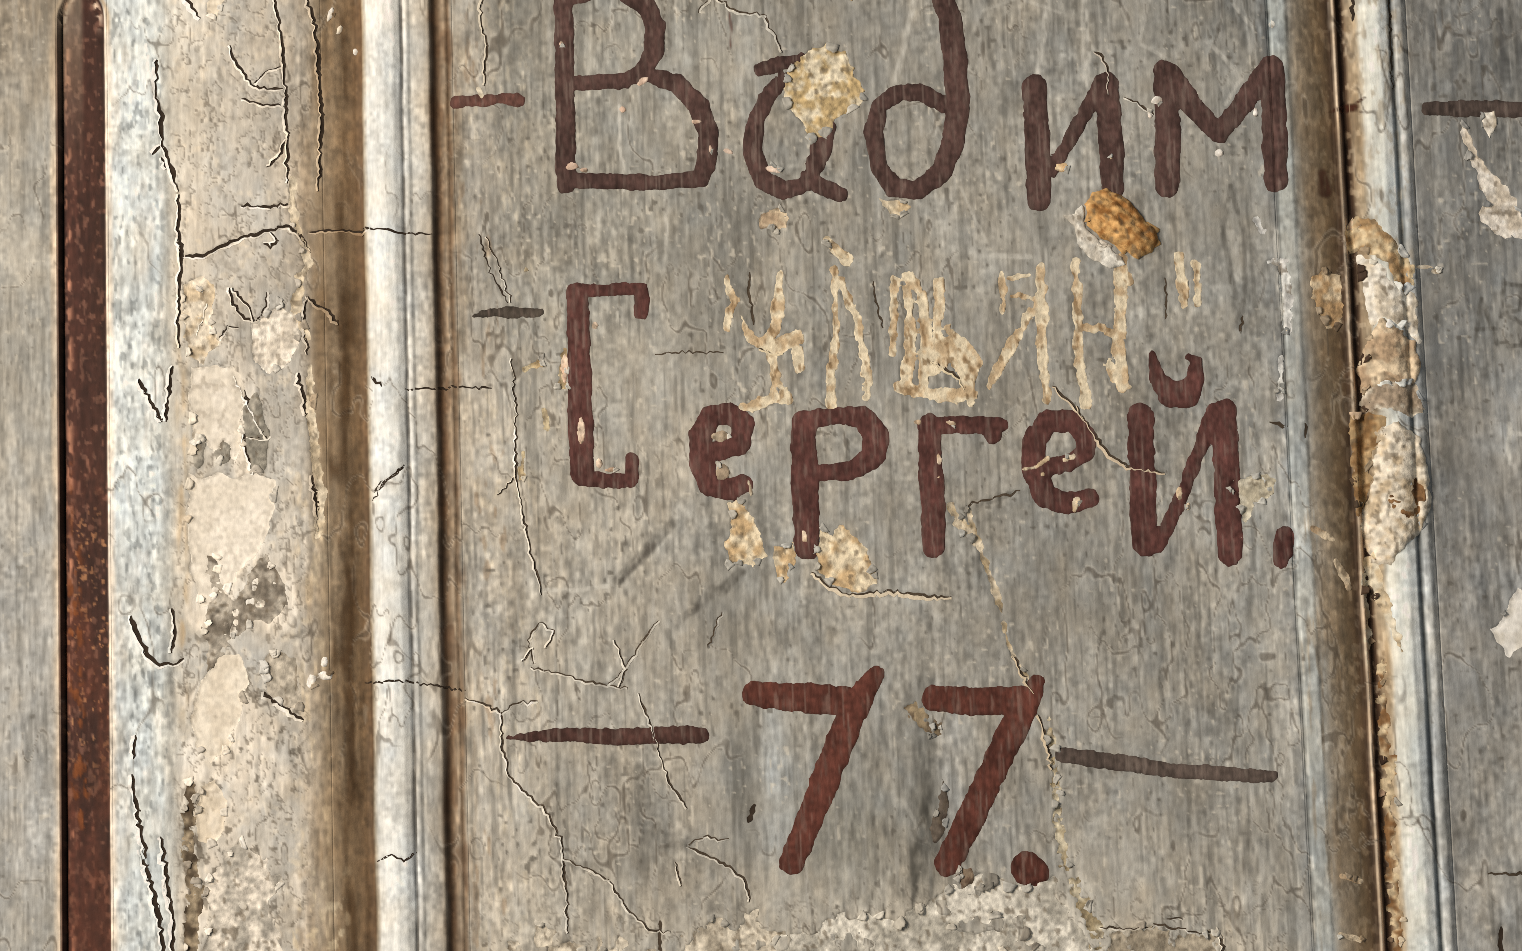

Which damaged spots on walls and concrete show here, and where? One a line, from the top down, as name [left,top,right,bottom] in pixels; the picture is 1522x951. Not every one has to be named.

spalling [782,42,868,145]
crack [136,0,432,423]
peeling [1063,205,1125,269]
peeling [1460,111,1522,239]
crack [1052,386,1165,475]
spalling [1267,216,1443,518]
crack [128,608,185,669]
crack [365,358,756,951]
crack [810,572,952,601]
peeling [1490,588,1522,658]
crack [128,735,175,951]
spalling [680,717,1223,951]